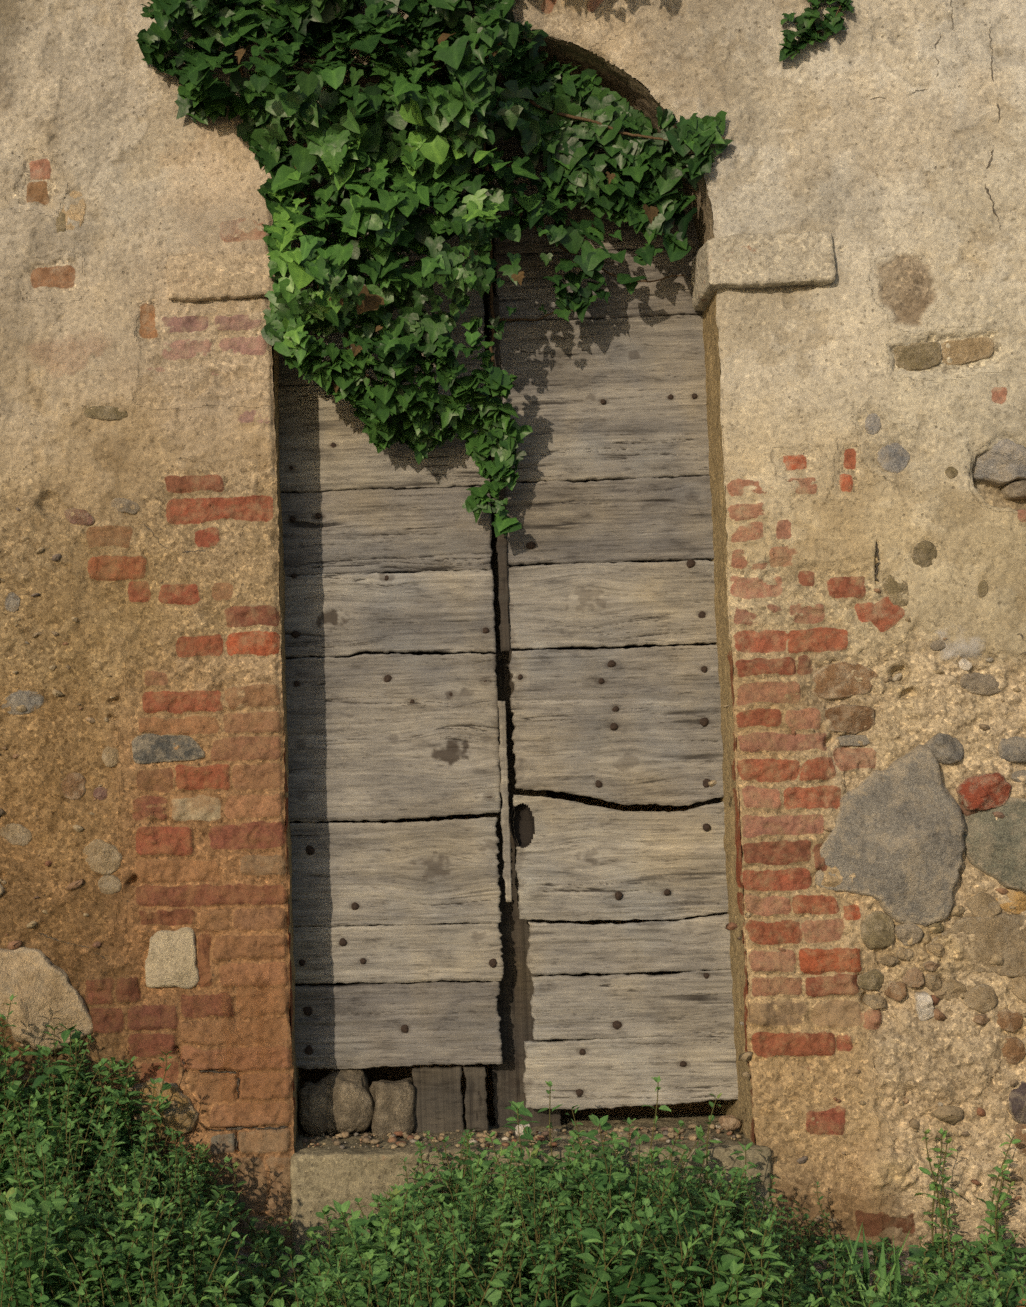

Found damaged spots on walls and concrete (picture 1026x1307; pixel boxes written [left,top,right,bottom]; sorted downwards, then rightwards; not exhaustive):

crack [870,0,954,100]
crack [985,29,1001,230]
spalling [771,397,921,505]
flaking render [945,439,1026,500]
flaking render [912,540,937,568]
spalling [0,454,294,1250]
spalling [727,553,1026,1254]